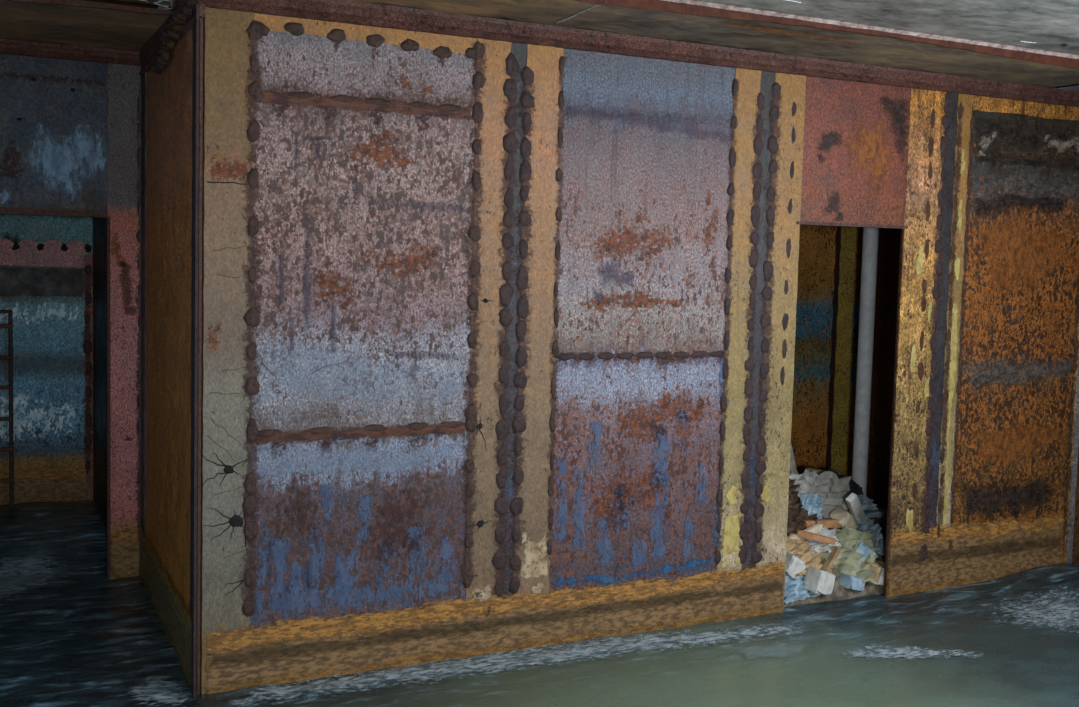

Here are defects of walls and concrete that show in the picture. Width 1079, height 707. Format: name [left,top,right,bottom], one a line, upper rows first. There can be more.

crack [197,363,277,596]
corrosion [211,20,487,617]
corrosion [491,52,536,597]
corrosion [547,56,740,565]
corrosion [738,82,797,564]
damp [972,120,1079,217]
corrosion [1063,279,1079,532]